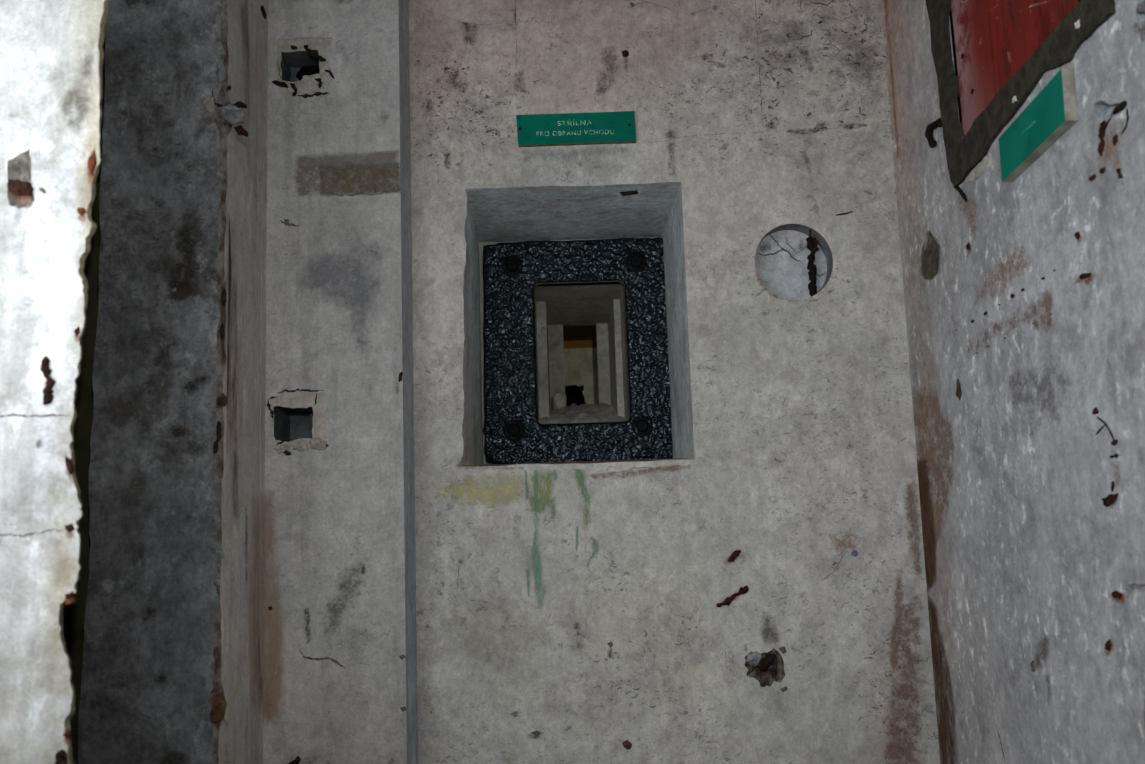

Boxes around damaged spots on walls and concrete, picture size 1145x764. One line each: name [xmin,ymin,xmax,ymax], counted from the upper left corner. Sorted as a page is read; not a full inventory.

spalling [203,59,249,137]
hole [272,37,334,98]
corrosion [1089,100,1129,181]
crack [758,234,826,277]
crack [0,411,70,419]
hole [267,389,329,456]
crack [0,529,66,541]
leakage [907,485,921,573]
spalling [744,619,787,692]
leakage [885,580,919,764]